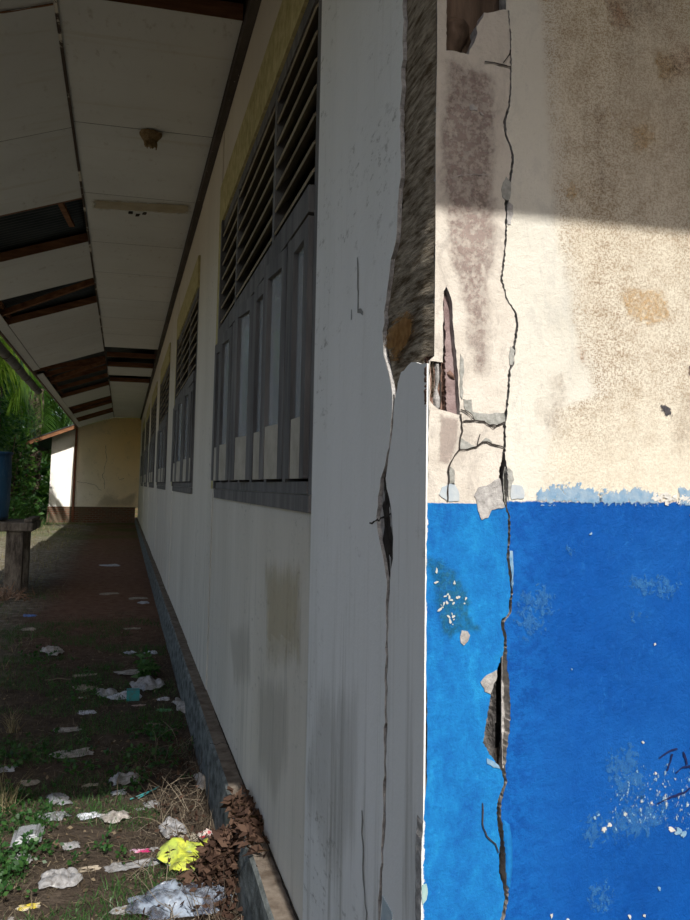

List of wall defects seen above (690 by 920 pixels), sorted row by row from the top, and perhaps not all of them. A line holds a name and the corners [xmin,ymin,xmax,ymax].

spalling [384,0,505,425]
water stain [443,67,492,332]
peeling [501,177,513,225]
peeling [439,467,459,502]
crack [447,409,506,505]
peeling [474,468,525,520]
peeling [537,482,690,507]
peeling [481,670,497,694]
crack [483,646,506,768]
peeling [593,760,690,838]
crack [482,803,502,881]